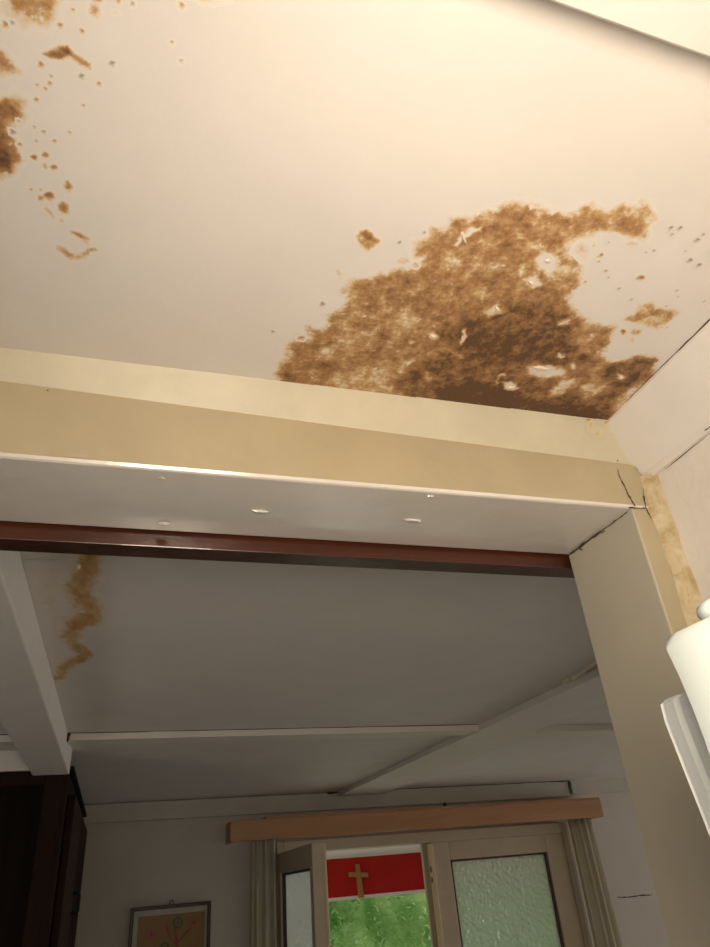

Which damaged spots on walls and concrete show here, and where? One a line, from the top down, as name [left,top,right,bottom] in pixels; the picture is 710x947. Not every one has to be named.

leakage [0,0,138,263]
leakage [269,195,685,436]
leakage [23,554,106,683]
crack [568,471,652,556]